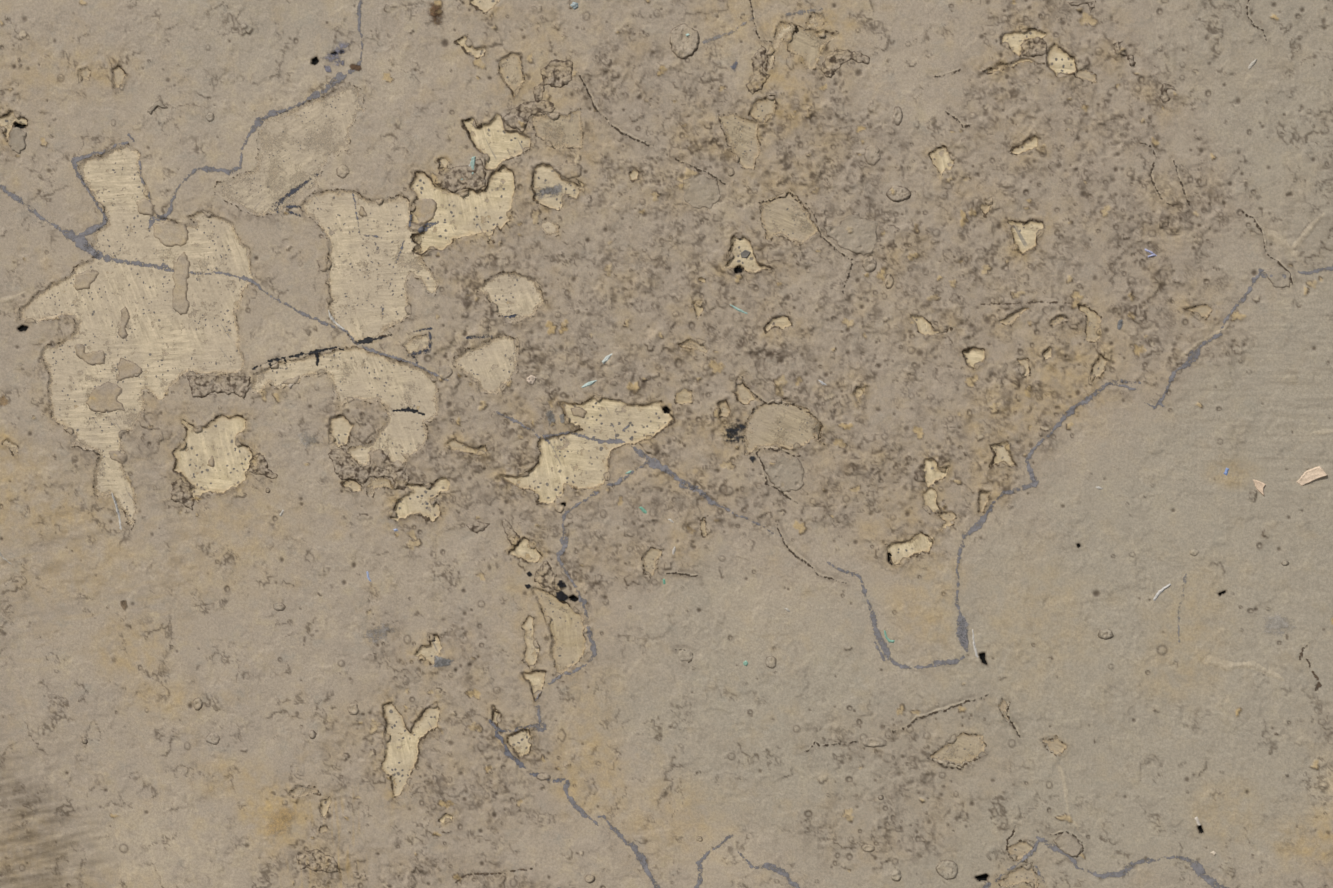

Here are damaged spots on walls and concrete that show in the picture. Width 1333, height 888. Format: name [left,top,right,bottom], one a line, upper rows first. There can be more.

crack [0,0,448,381]
peeling [19,72,654,527]
crack [392,407,425,416]
peeling [503,389,693,505]
crack [827,266,1333,669]
peeling [521,589,588,701]
crack [489,411,781,888]
crack [1299,645,1322,691]
peeling [381,701,440,798]
crack [455,868,559,888]
crack [694,835,800,888]
crack [982,836,1229,888]